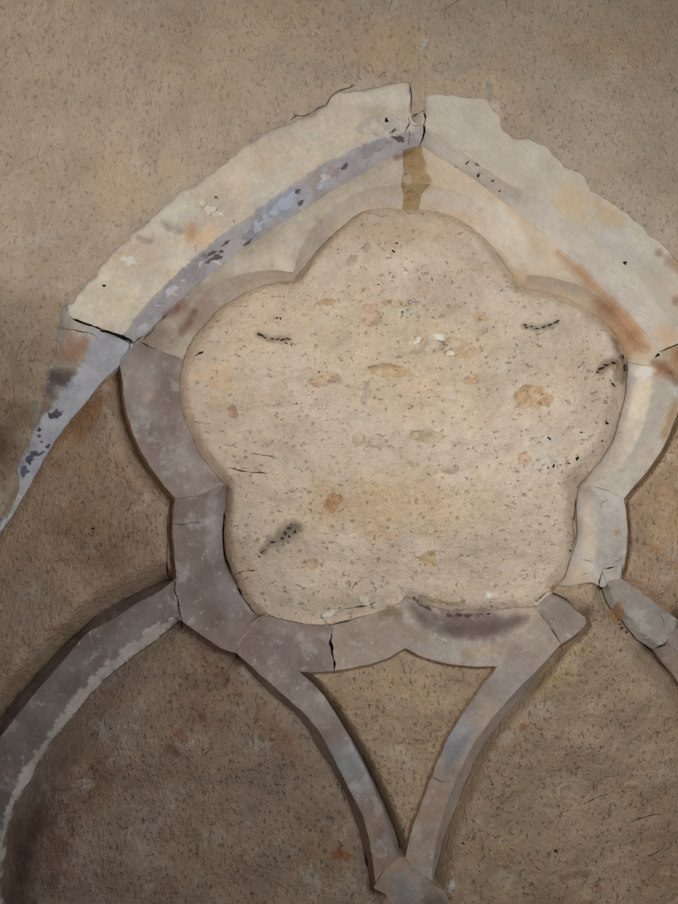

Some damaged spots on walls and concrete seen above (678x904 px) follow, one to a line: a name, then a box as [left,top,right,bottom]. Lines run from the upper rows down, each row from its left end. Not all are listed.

spalling [354,113,422,159]
peeling [317,163,348,190]
peeling [242,189,304,246]
peeling [137,240,230,336]
crack [65,302,167,351]
flaking render [408,333,477,358]
peeling [596,355,652,378]
spalling [360,363,413,405]
flaking render [513,384,553,409]
spalling [408,430,446,443]
spalling [324,492,343,513]